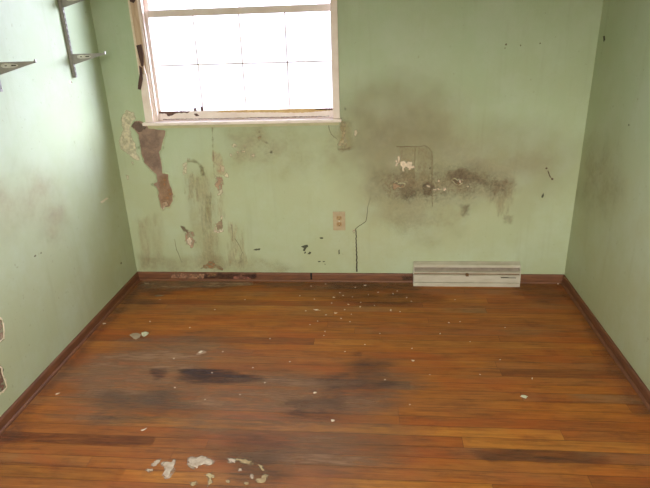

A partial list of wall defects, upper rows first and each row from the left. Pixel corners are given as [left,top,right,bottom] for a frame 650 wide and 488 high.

peeling [119,110,175,211]
crack [353,200,370,272]